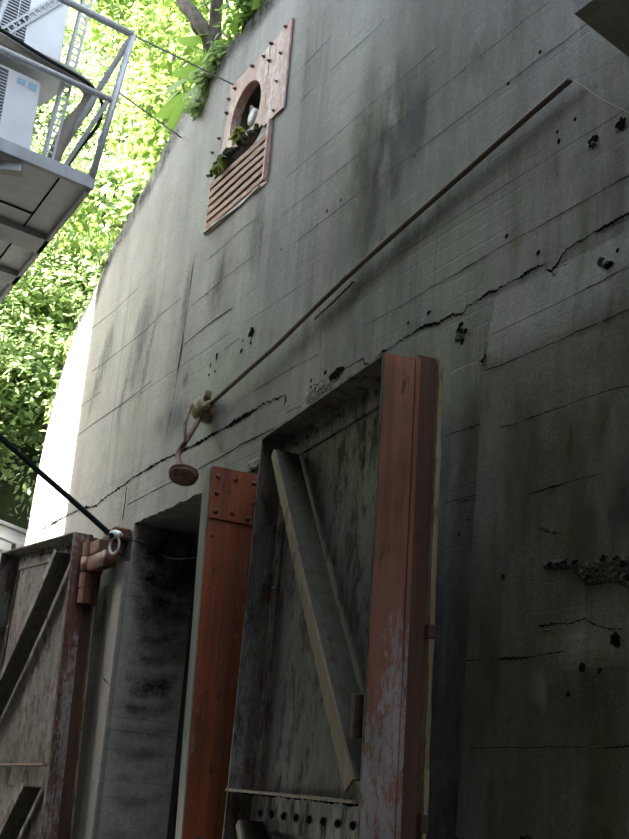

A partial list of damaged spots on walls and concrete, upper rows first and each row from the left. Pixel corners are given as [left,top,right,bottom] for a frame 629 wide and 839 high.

crack [346,212,629,368]
crack [170,261,194,418]
spalling [455,321,467,345]
spalling [306,366,345,404]
crack [32,383,320,536]
spalling [543,554,629,588]
crack [538,618,625,633]
crack [466,651,565,662]